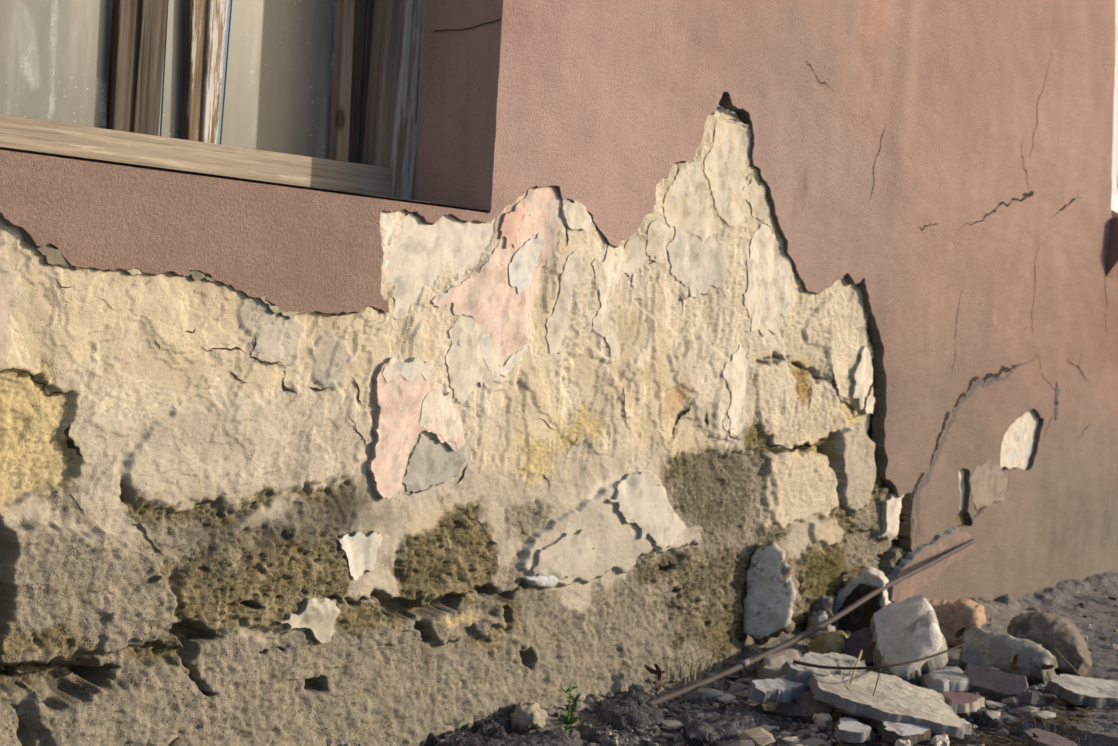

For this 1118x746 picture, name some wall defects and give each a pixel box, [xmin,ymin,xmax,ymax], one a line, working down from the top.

crack [433,18,502,32]
crack [920,46,1053,231]
flaking render [0,106,908,746]
crack [896,223,1108,543]
spalling [1000,409,1039,470]